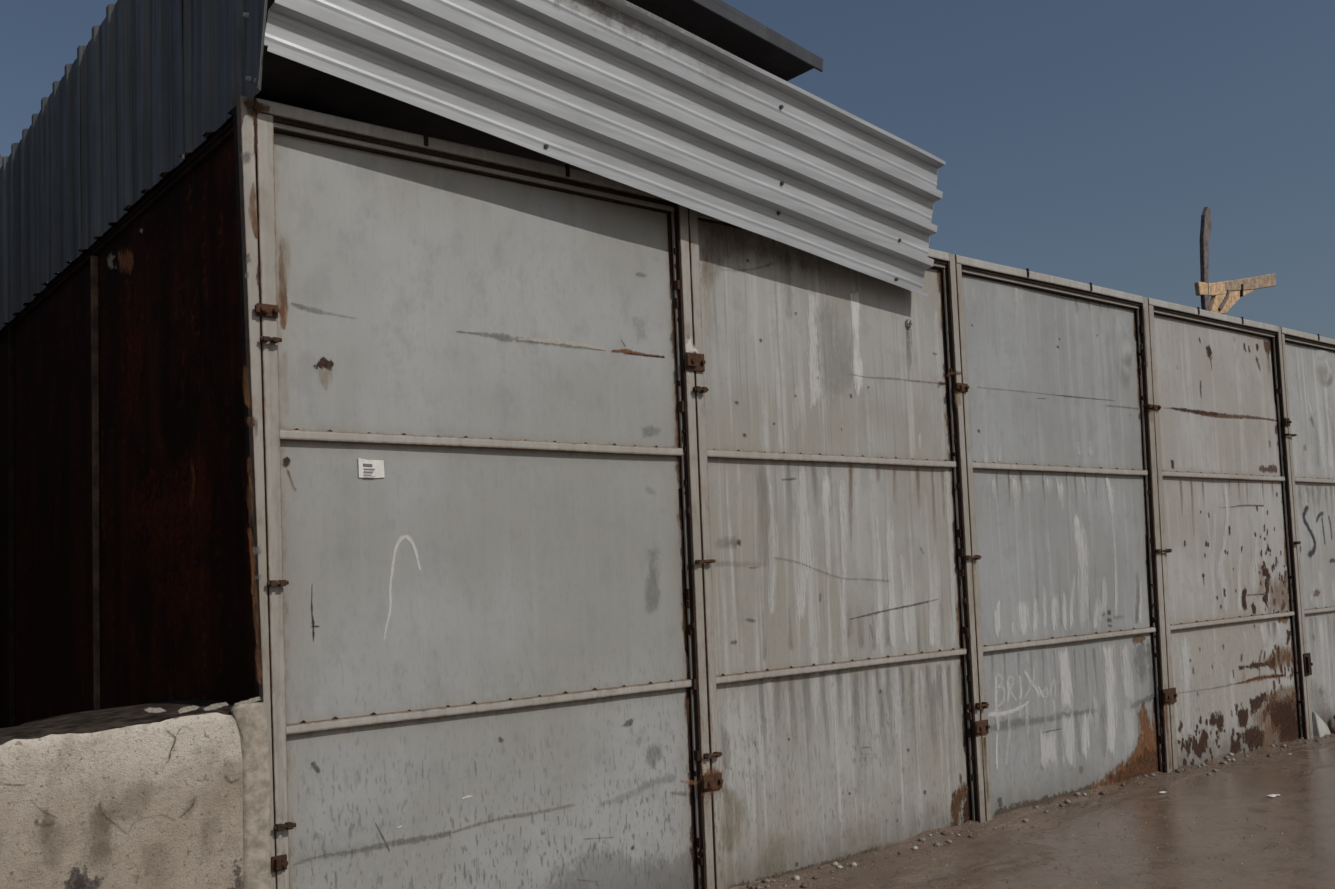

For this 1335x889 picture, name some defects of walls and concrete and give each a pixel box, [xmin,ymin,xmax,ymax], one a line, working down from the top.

peeling [107,250,134,274]
corrosion [314,357,334,370]
corrosion [1134,319,1148,407]
corrosion [250,548,262,685]
corrosion [1090,535,1301,789]